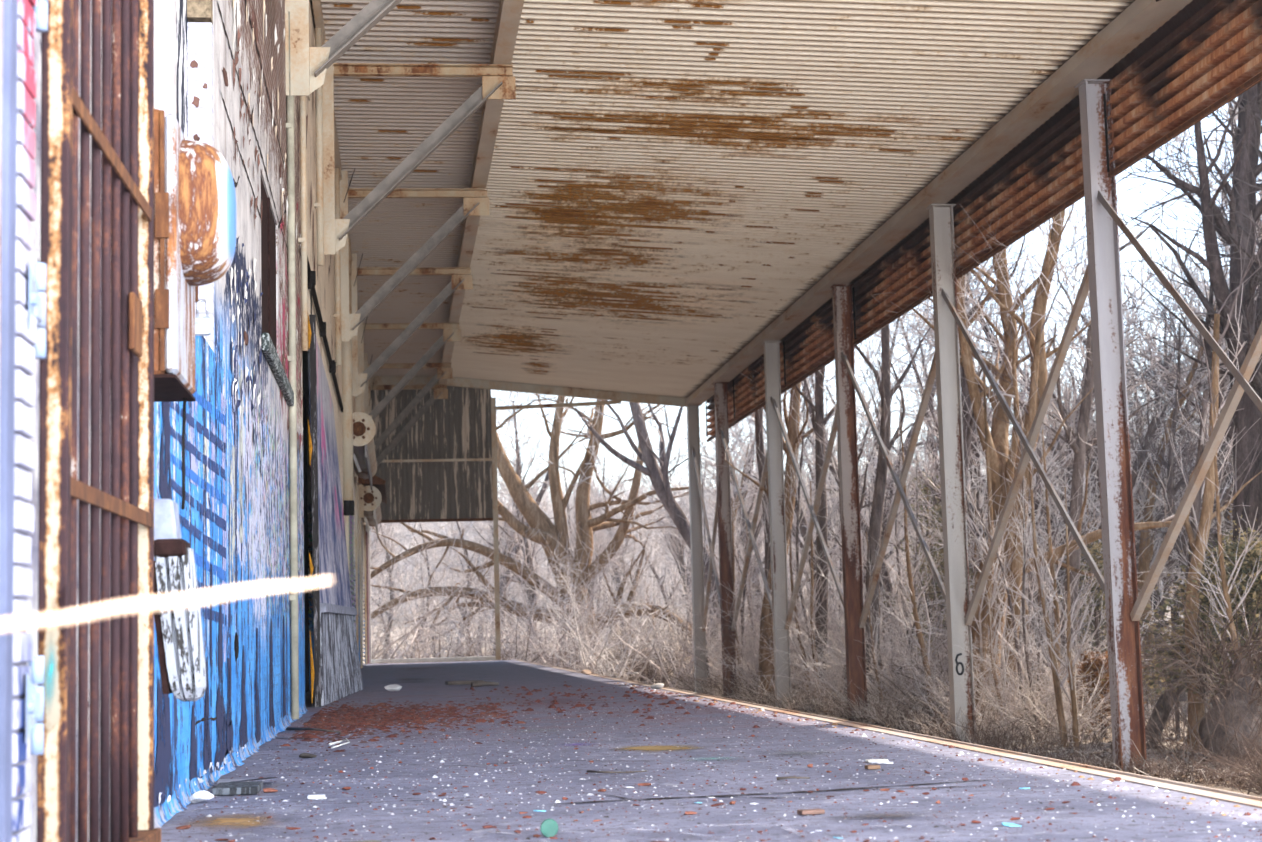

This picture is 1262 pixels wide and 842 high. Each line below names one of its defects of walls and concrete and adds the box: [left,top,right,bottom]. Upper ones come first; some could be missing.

rust [593,0,731,61]
rust [528,70,964,156]
rust [791,177,844,212]
rust [467,166,795,374]